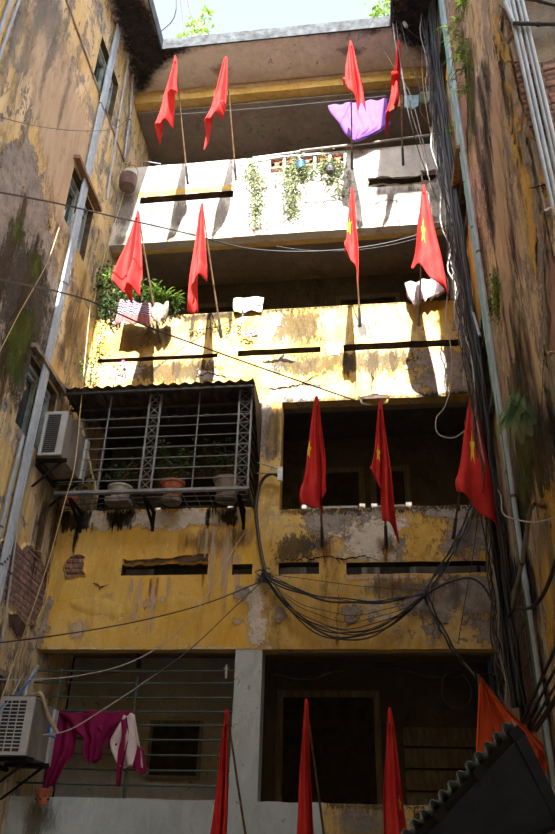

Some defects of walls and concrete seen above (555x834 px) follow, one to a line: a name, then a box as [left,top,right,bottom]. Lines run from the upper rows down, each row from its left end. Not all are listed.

damp [476,27,515,306]
damp [0,193,54,415]
peeling [254,311,287,349]
peeling [99,361,148,385]
peeling [197,368,222,381]
peeling [404,339,471,396]
peeling [260,371,325,458]
peeling [88,507,252,533]
peeling [299,505,492,562]
spalling [0,537,288,649]
peeling [340,572,502,647]